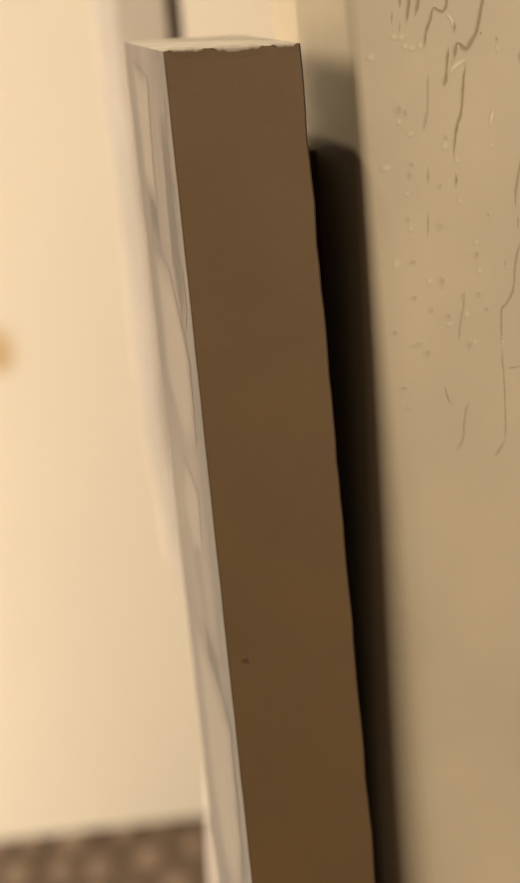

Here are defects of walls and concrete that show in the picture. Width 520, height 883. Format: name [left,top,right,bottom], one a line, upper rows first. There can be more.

crack [391,0,486,187]
crack [493,161,520,457]